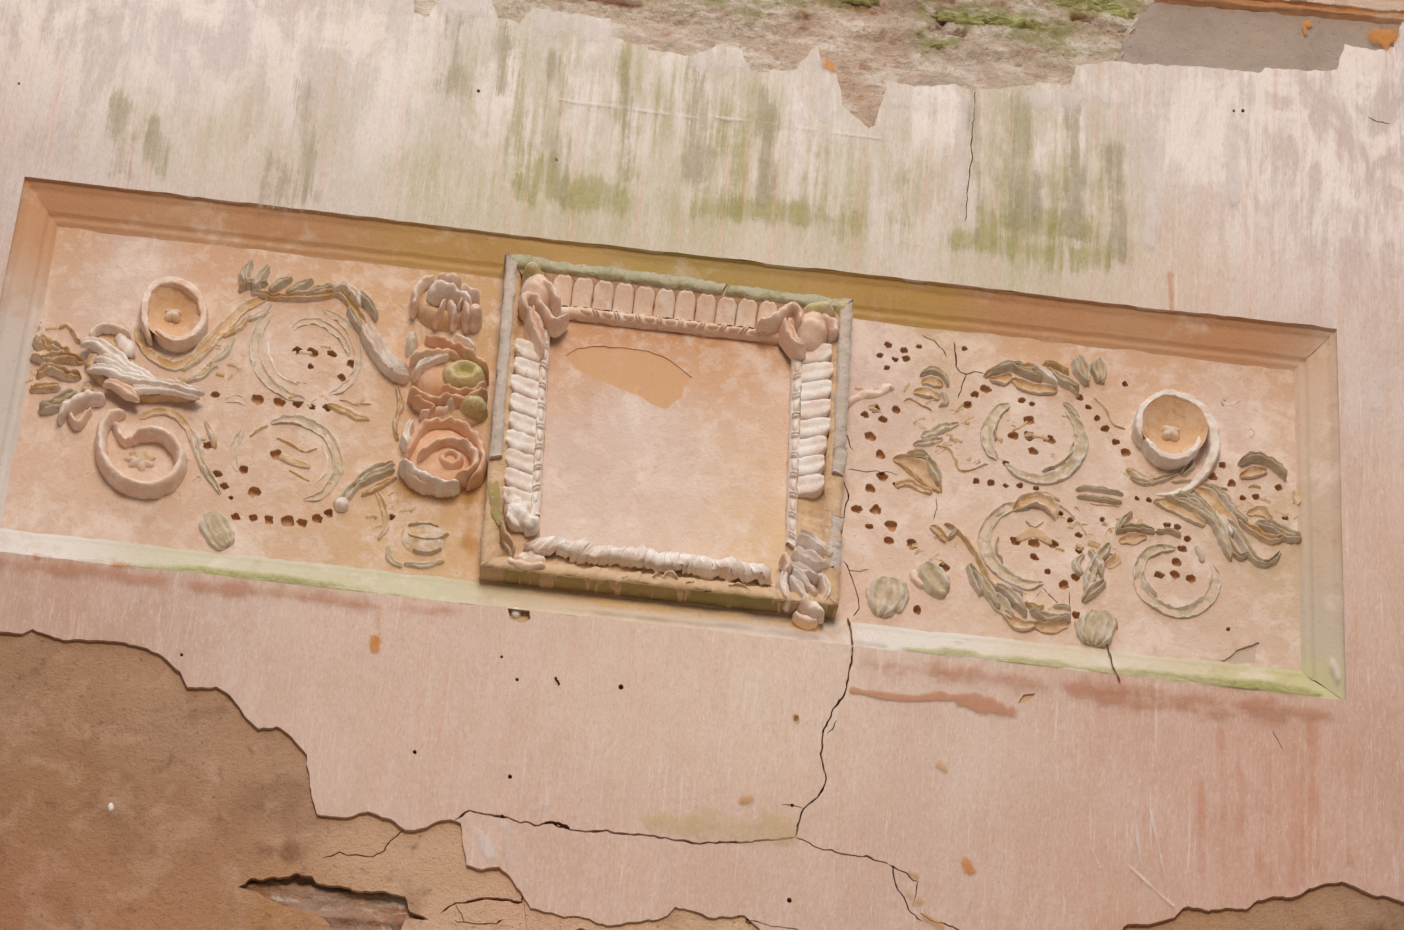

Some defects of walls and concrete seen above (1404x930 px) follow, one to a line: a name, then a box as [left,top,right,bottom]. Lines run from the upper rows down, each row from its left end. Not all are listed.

spalling [414,0,439,17]
damp [496,23,510,92]
spalling [492,0,1401,128]
damp [144,117,167,174]
damp [757,90,779,205]
crack [965,92,975,220]
damp [1011,93,1084,236]
peeling [566,346,692,409]
crack [460,570,859,845]
peeling [0,631,759,930]
crack [444,898,523,925]
peeling [1123,883,1404,930]